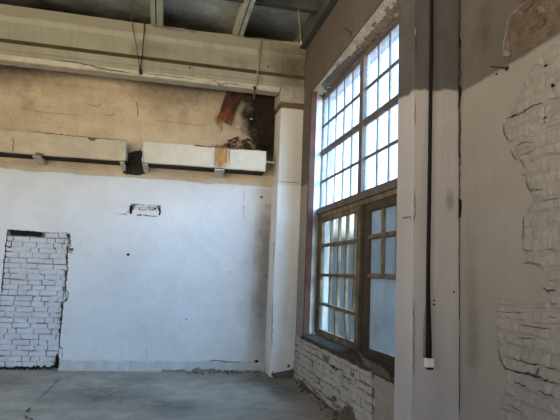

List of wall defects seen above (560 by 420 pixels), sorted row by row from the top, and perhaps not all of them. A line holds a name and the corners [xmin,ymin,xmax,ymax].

flaking render [325,0,399,87]
crack [57,60,185,78]
crack [33,131,128,141]
spalling [123,148,145,175]
rust [215,147,230,167]
flaking render [129,204,161,217]
flaking render [495,0,560,420]
spalling [271,364,322,402]
flaking render [341,405,355,420]